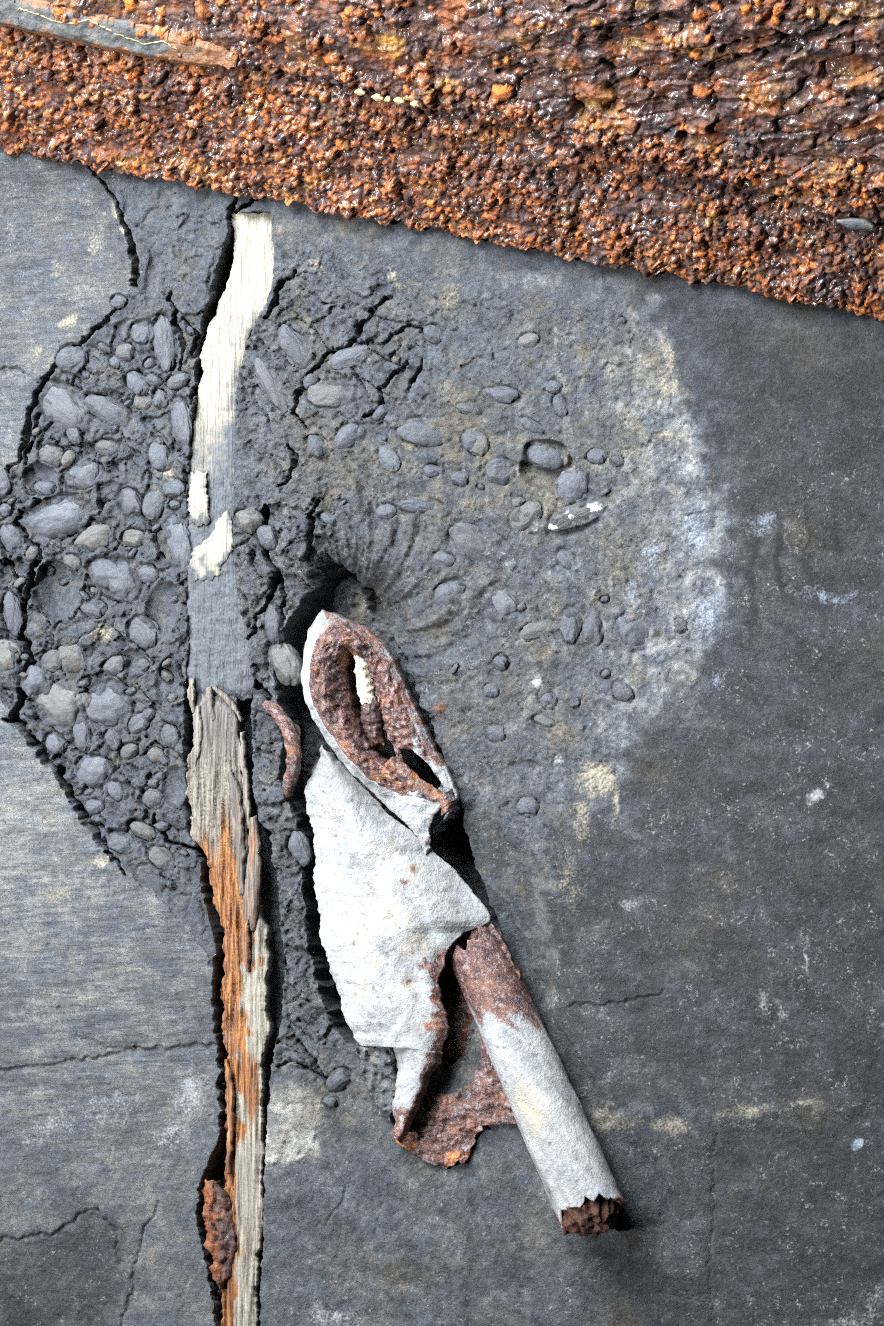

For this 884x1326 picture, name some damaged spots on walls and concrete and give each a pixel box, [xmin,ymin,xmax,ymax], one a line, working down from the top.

rust [0,0,884,321]
crack [240,295,424,1125]
spalling [0,178,737,1134]
rust [309,624,445,798]
crack [0,813,229,1326]